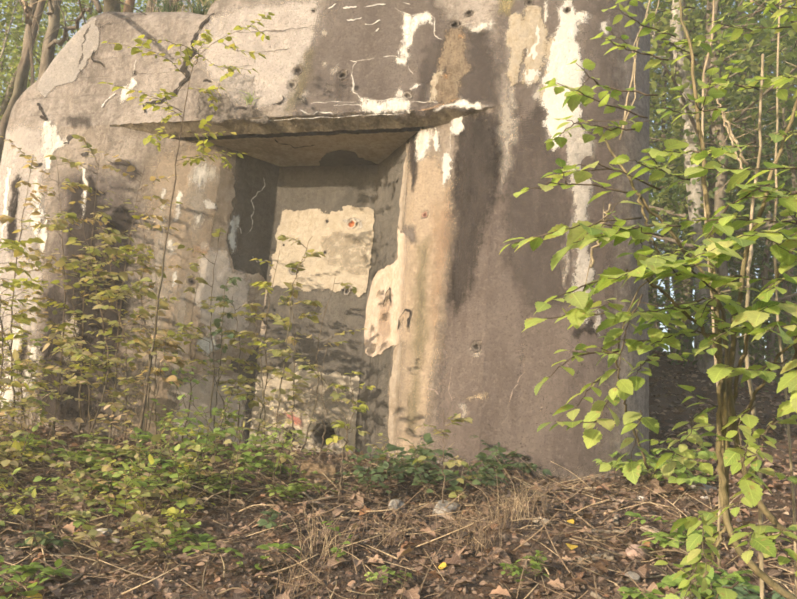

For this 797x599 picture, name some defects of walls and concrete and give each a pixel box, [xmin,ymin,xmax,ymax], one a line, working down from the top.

crack [79,22,110,74]
crack [142,2,440,115]
water stain [0,103,134,422]
water stain [129,147,228,444]
peeling [175,143,411,458]
water stain [201,0,623,481]